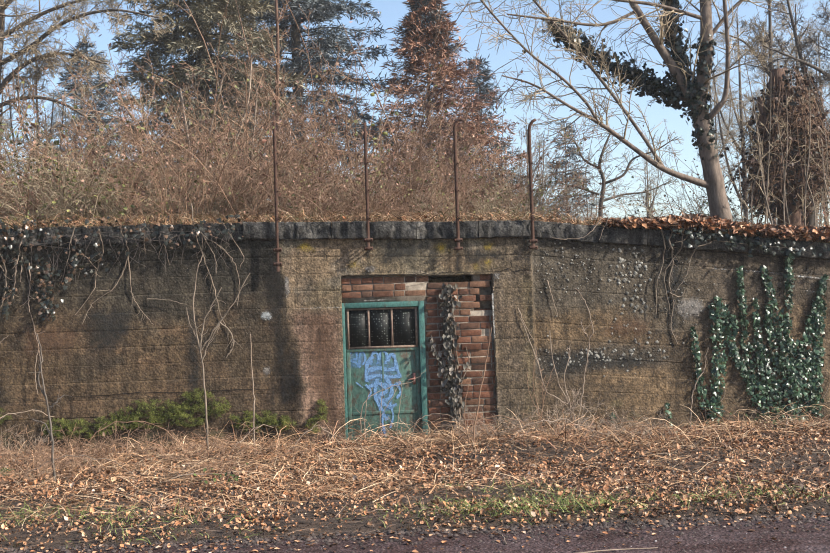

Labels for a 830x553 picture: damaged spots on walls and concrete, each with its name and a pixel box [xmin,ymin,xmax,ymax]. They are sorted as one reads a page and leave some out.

water stain [264,252,300,416]
water stain [550,354,640,370]